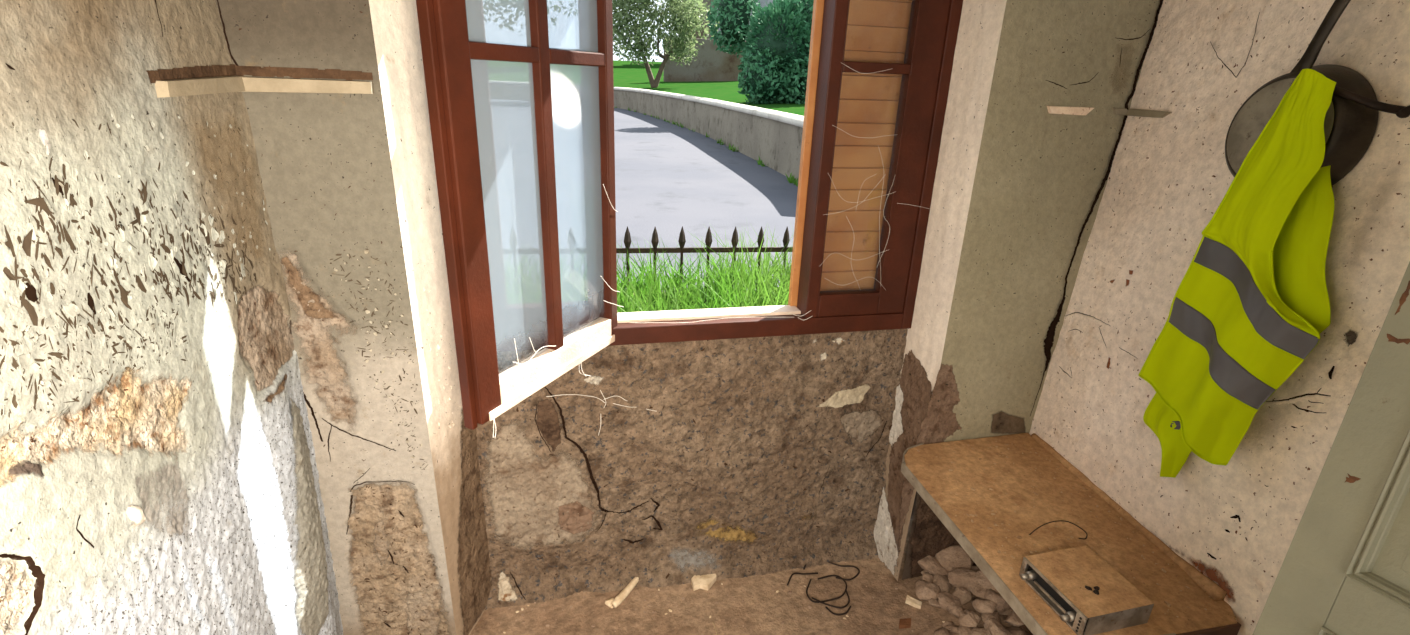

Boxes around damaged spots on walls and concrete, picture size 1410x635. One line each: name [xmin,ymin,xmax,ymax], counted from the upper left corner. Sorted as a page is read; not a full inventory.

crack [1030,0,1163,416]
peeling [583,360,624,399]
peeling [498,572,526,601]
spalling [485,399,623,578]
crack [535,387,649,532]
spalling [622,498,691,544]
peeling [793,338,974,575]